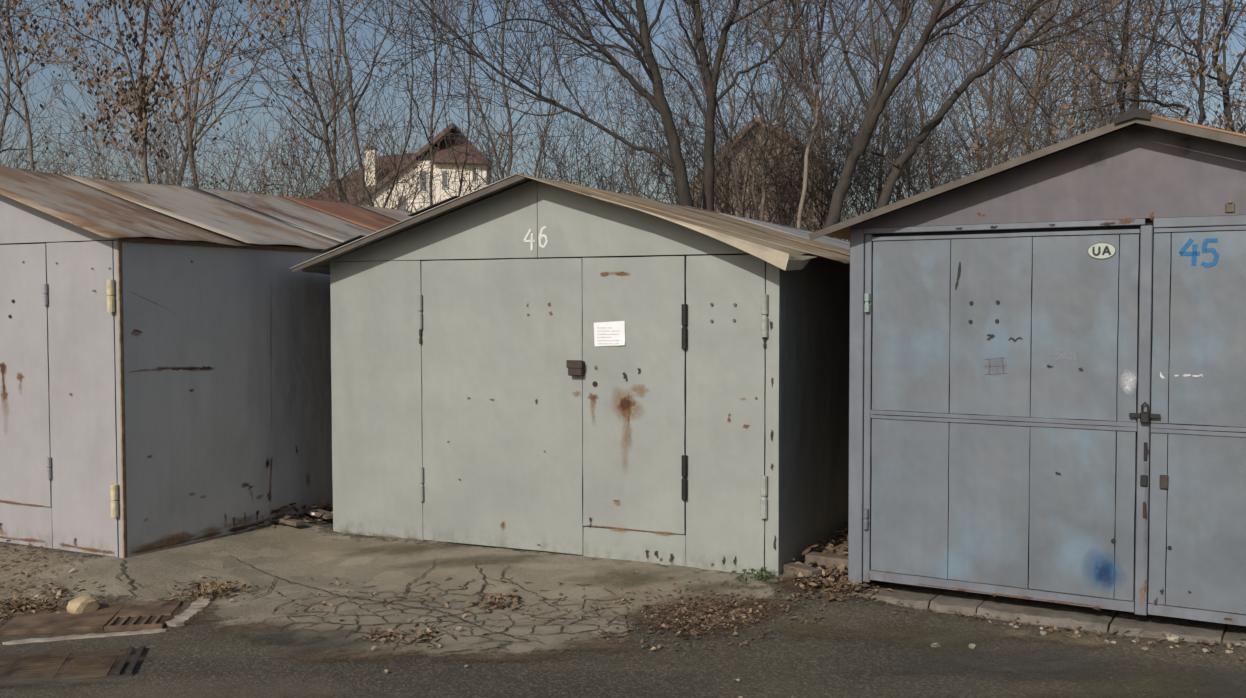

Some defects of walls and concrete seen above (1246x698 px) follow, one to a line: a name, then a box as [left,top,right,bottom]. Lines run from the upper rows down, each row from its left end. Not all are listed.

rust [0,363,23,404]
rust [617,387,644,442]
rust [135,459,272,553]
crack [229,555,641,653]